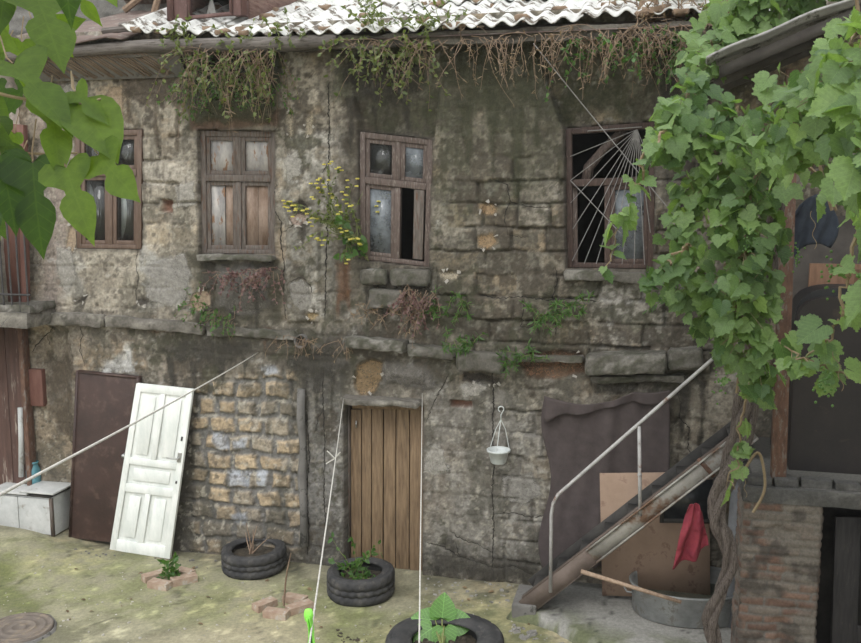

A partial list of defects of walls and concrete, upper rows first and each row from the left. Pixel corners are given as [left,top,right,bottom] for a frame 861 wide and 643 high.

crack [274,82,330,318]
damp [288,345,333,431]
spalling [352,360,384,395]
crack [428,373,542,567]